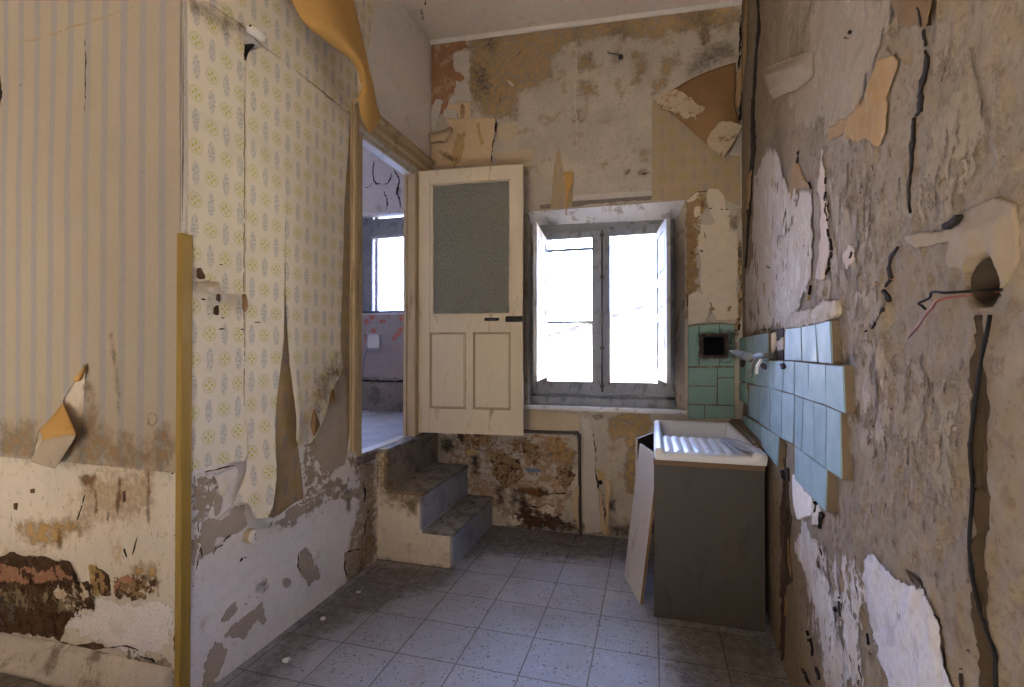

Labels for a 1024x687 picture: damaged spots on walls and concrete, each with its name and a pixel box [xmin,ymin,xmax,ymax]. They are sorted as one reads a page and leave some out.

peeling [654,12,742,157]
crack [906,7,932,213]
crack [364,163,403,210]
peeling [685,147,884,370]
damp [17,520,77,547]
flaking render [0,552,156,643]
flaking render [191,467,247,565]
flaking render [201,597,267,687]
flaking render [268,372,377,579]
damp [497,487,579,532]
flaking render [779,444,877,687]
flaking render [933,613,964,687]